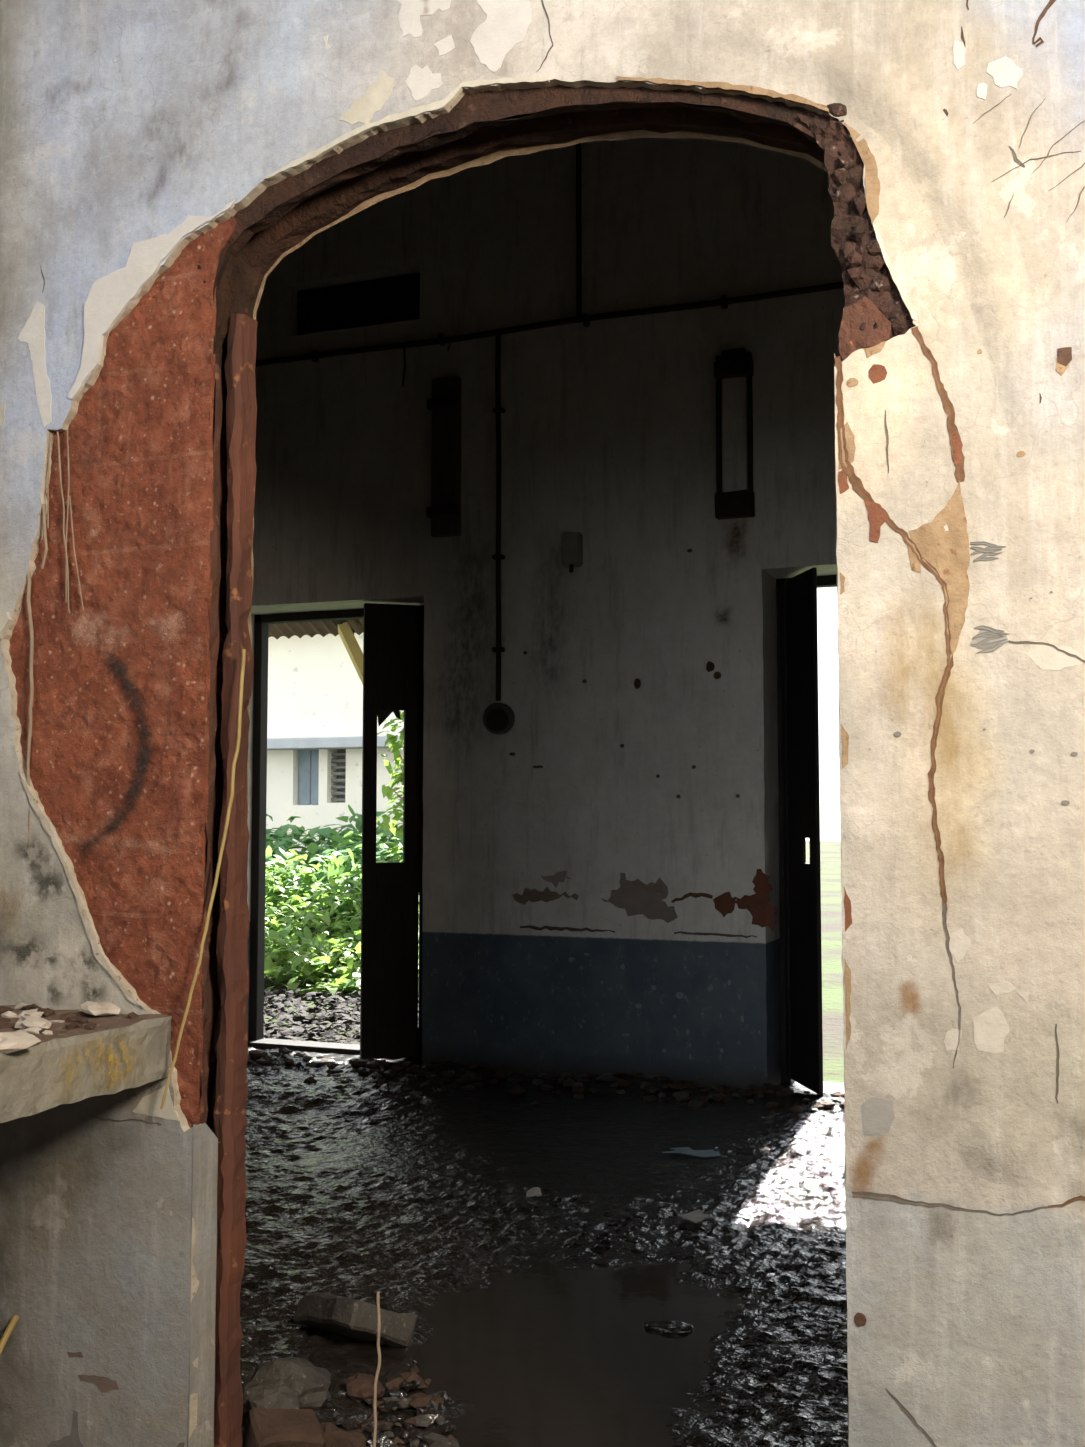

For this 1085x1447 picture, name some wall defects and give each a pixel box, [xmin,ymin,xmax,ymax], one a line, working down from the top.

crack [1032,0,1056,47]
peeling [264,0,550,181]
spalling [0,200,237,1124]
crack [835,326,970,1068]
peeling [513,871,579,905]
peeling [601,869,777,932]
crack [852,1191,1085,1216]